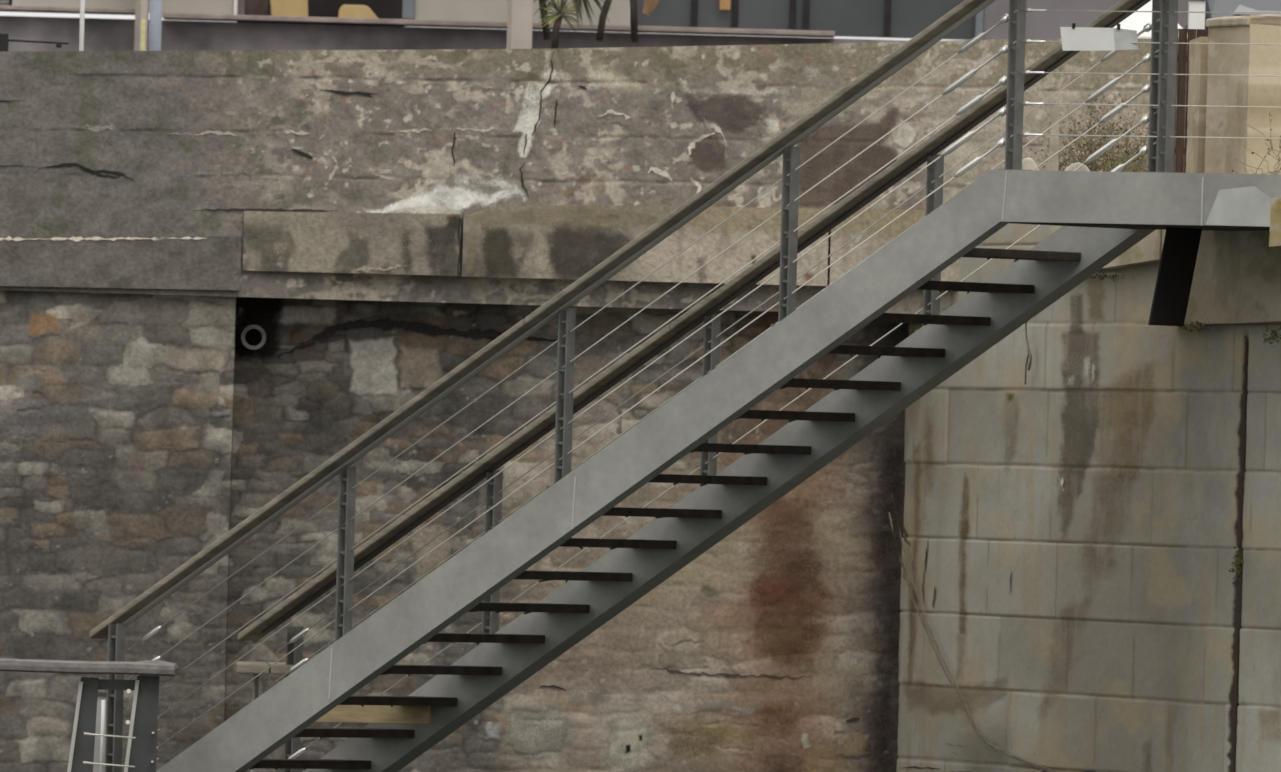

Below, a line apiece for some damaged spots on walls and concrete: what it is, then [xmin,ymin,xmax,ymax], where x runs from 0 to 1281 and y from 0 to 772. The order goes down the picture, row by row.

crack [0,163,133,180]
water stain [1059,279,1152,574]